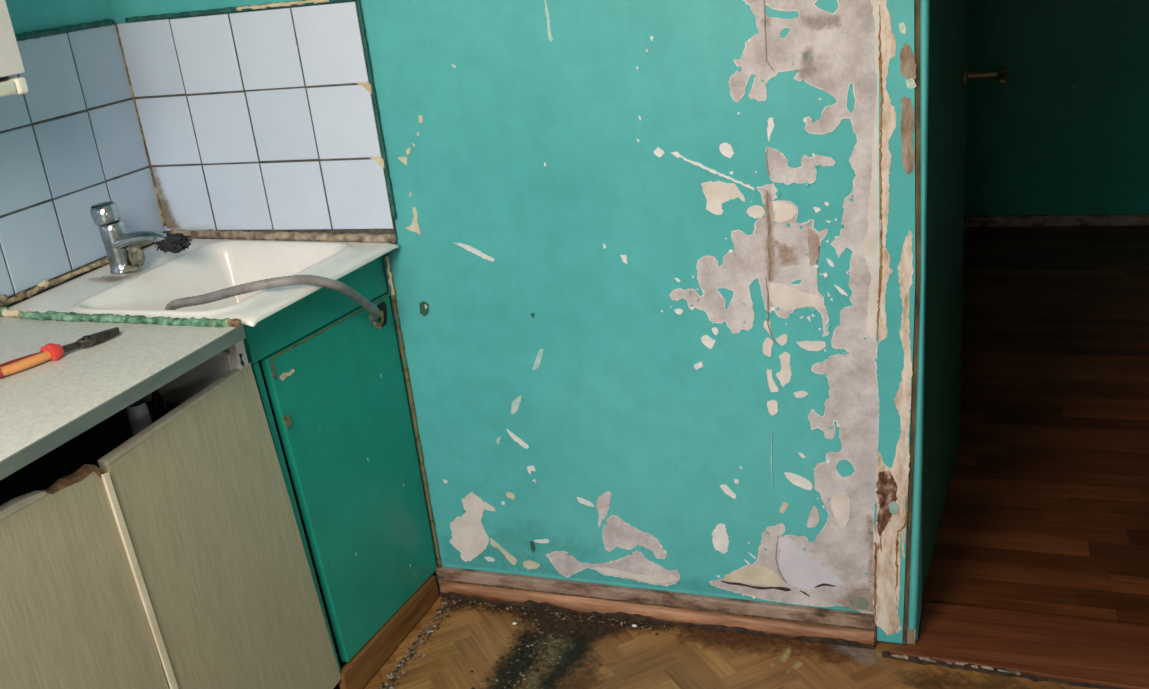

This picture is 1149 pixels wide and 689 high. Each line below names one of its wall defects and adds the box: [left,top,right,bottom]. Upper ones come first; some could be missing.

peeling [398,115,423,165]
peeling [406,192,421,235]
peeling [661,0,917,614]
peeling [449,491,680,587]
corrosion [843,521,882,621]
corrosion [895,497,907,608]
water stain [538,631,595,689]